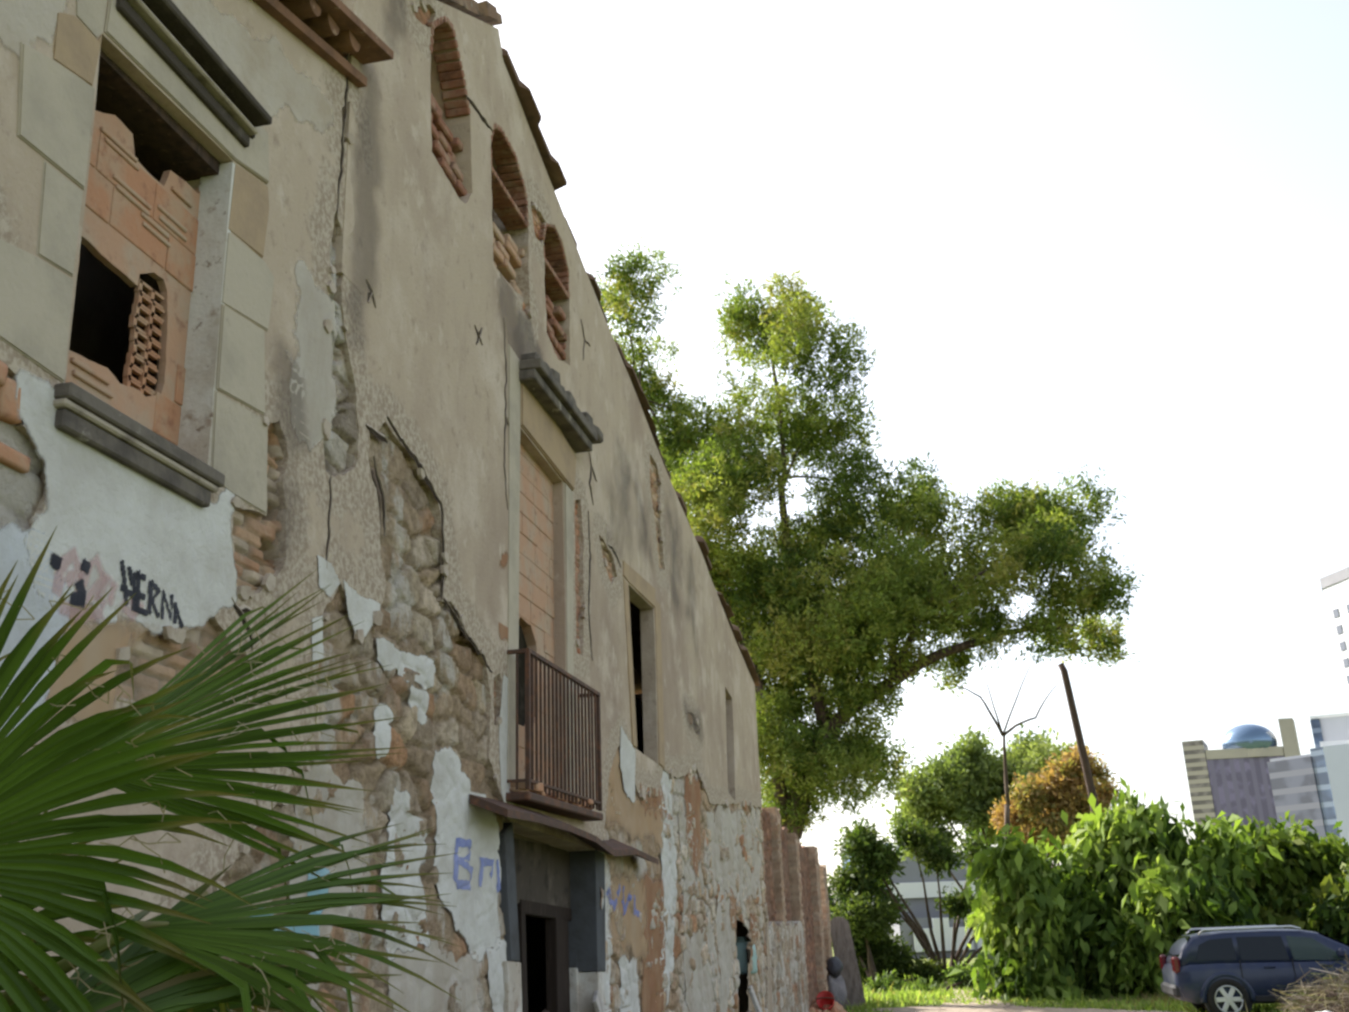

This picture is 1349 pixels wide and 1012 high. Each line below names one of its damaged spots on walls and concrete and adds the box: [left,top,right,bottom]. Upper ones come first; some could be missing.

crack [337,53,350,215]
spalling [123,279,165,396]
peeling [0,360,284,704]
crack [325,476,333,563]
peeling [0,661,55,737]
flaking render [213,225,514,1012]
flaking render [598,726,769,1012]